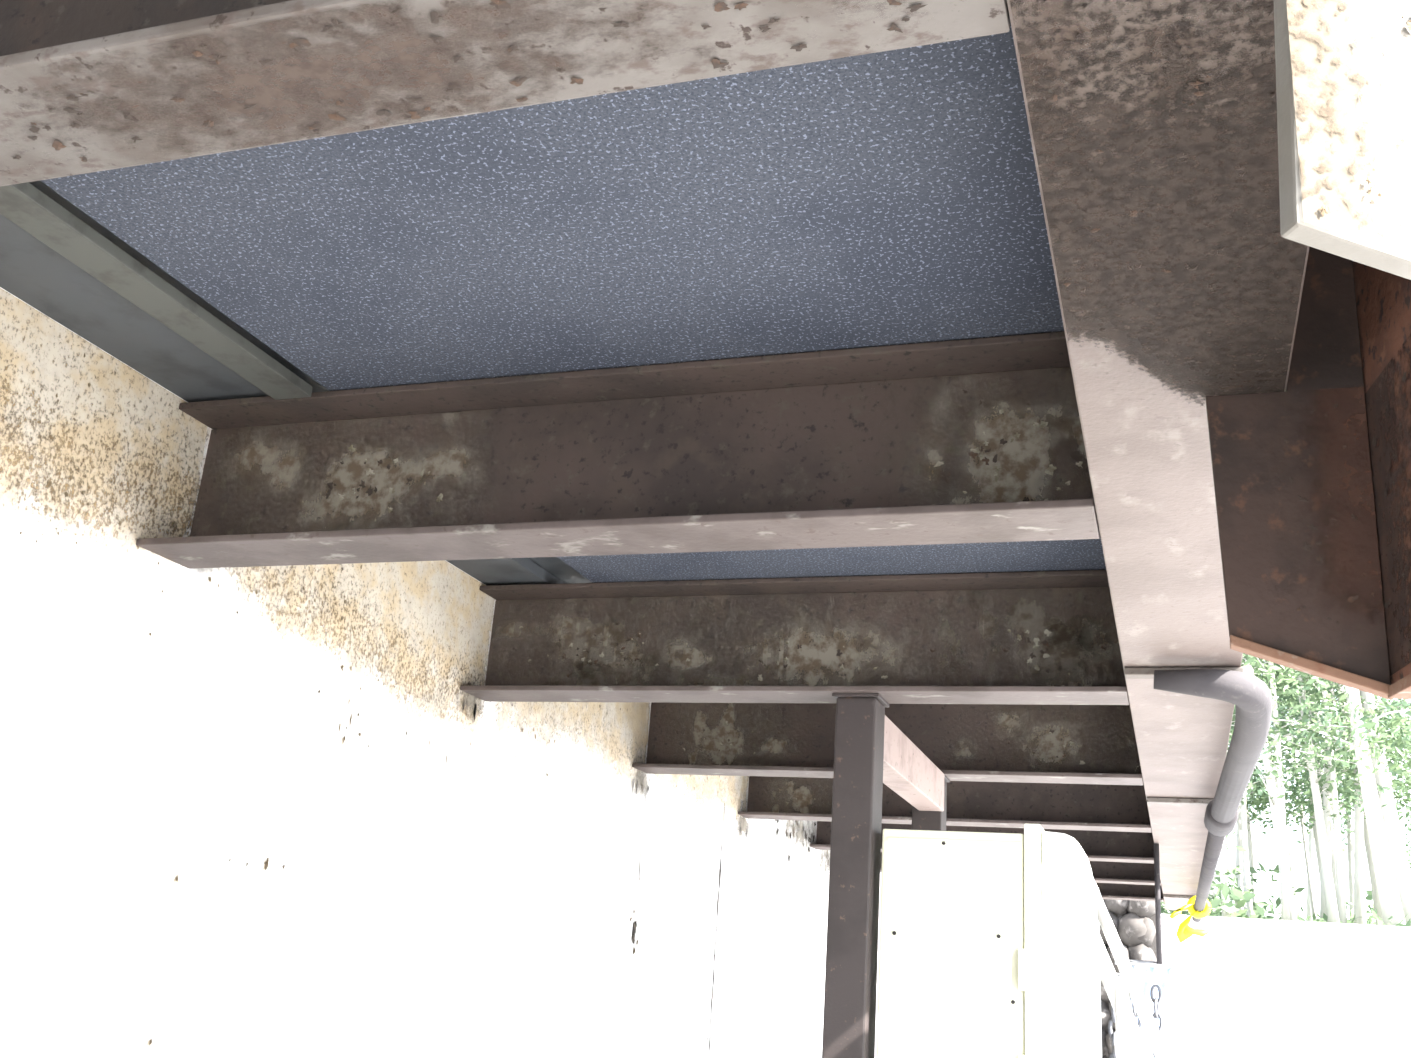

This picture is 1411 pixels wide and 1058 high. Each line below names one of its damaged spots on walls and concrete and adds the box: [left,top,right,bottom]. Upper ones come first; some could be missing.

corrosion [701,2,749,30]
corrosion [886,0,928,33]
corrosion [711,58,729,69]
corrosion [26,0,646,162]
corrosion [1289,335,1411,676]